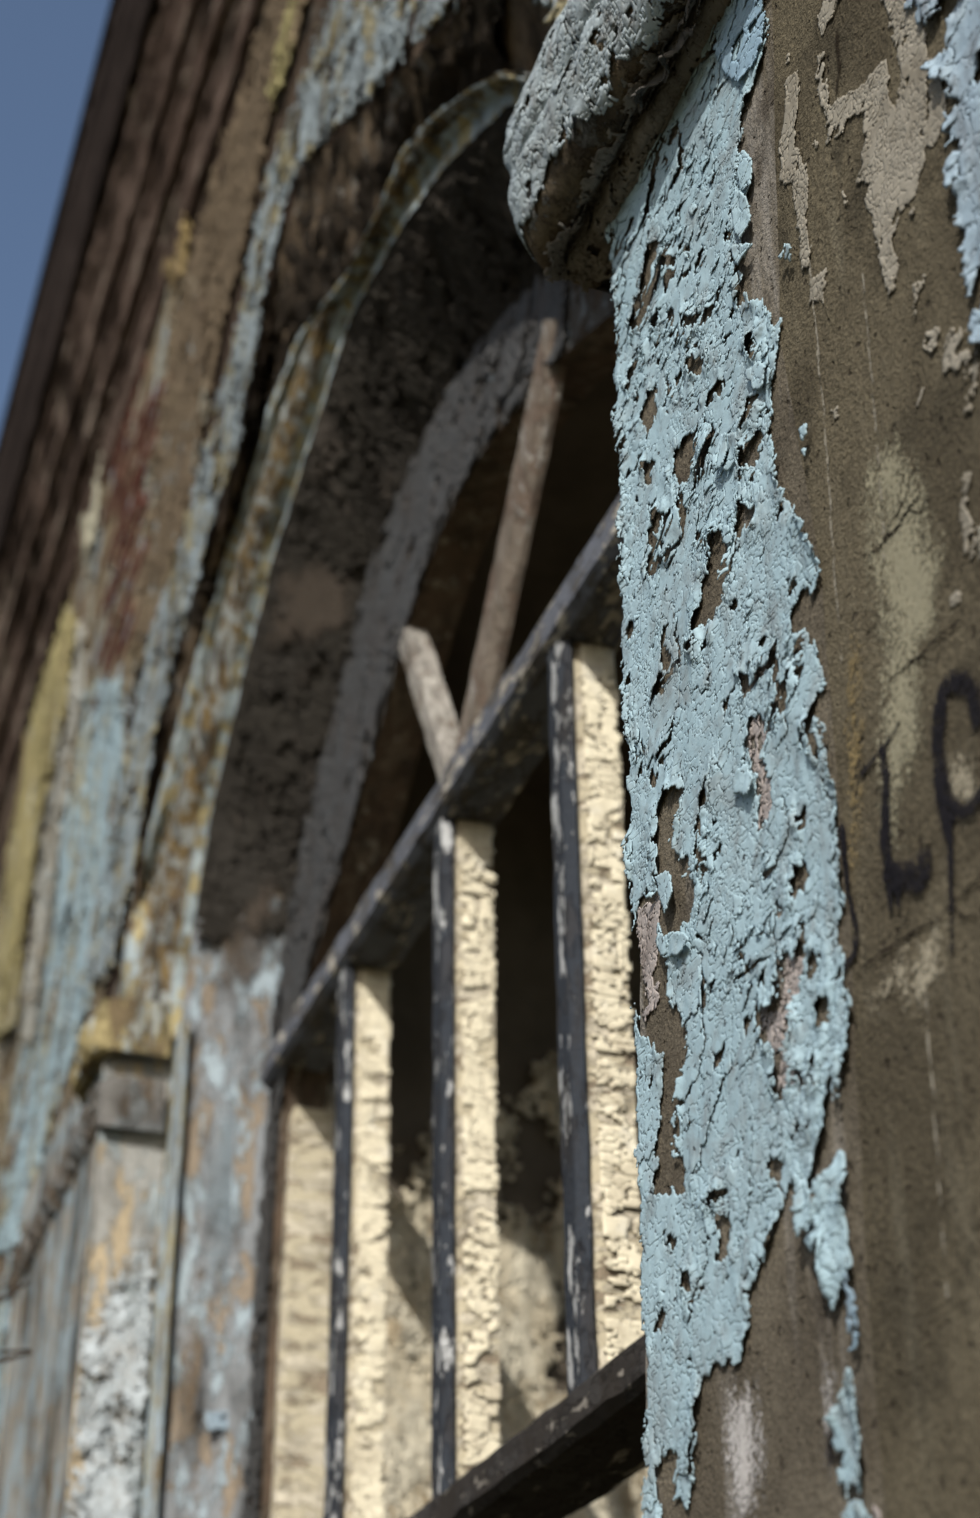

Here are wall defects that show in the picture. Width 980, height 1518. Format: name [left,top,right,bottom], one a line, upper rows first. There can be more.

peeling [73,0,852,1518]